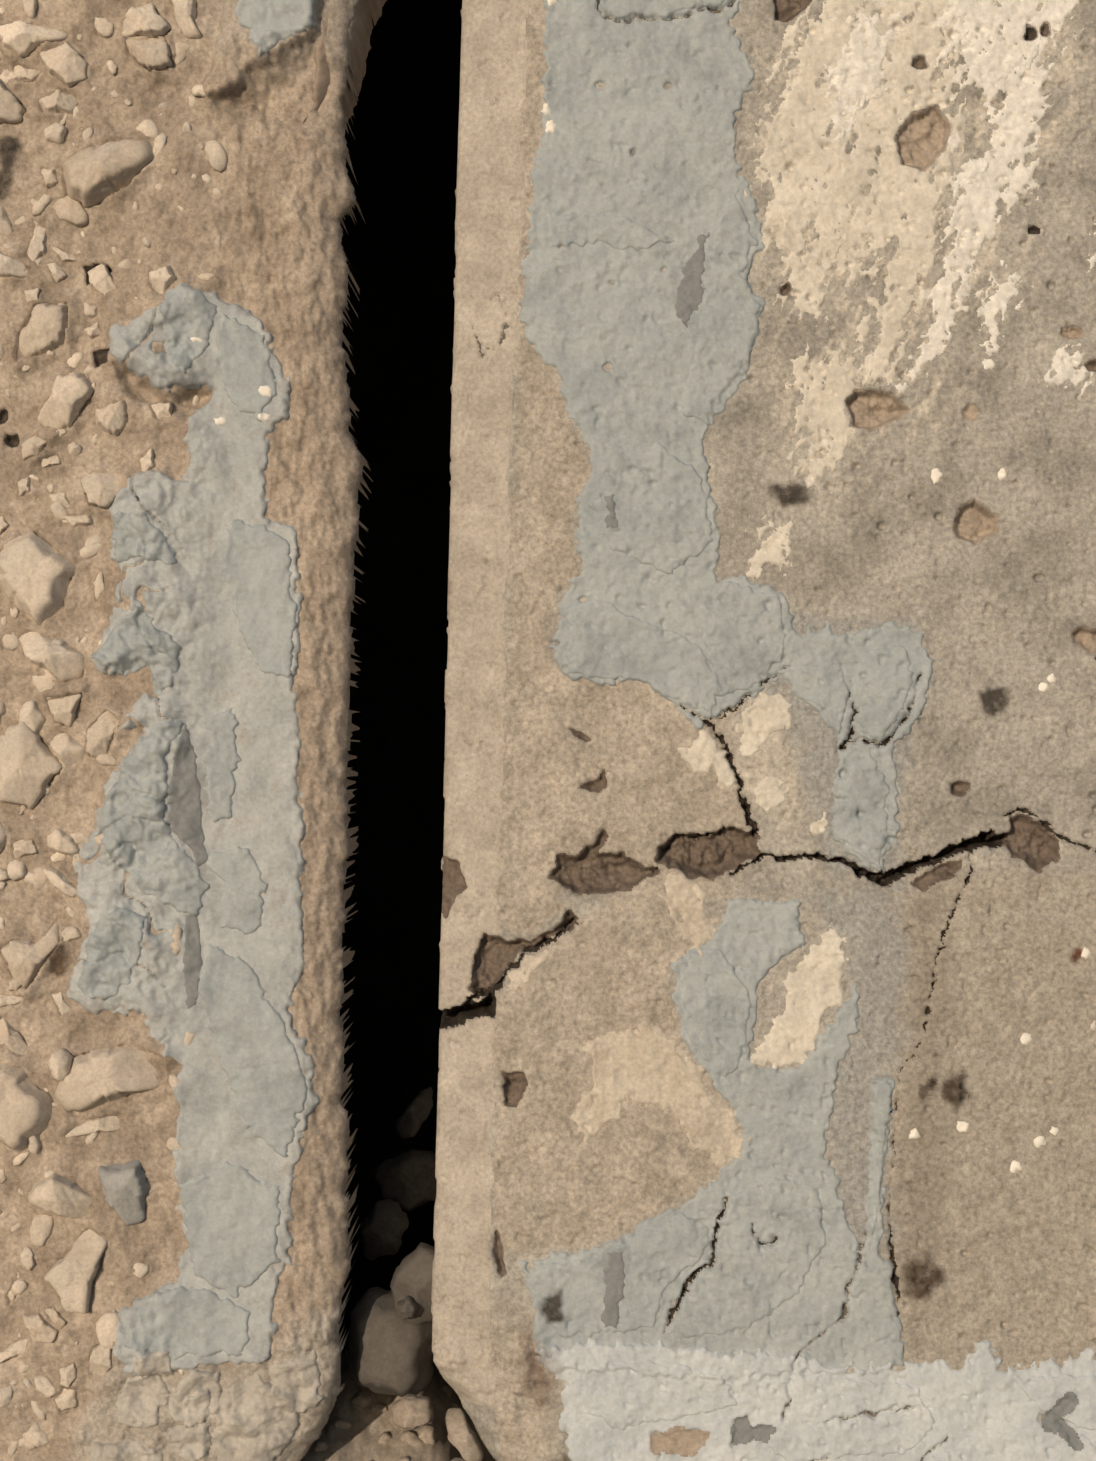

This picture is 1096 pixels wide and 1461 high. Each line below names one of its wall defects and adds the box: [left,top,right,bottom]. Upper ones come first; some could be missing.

peeling [234,0,318,57]
leakage [771,484,808,505]
peeling [518,0,1094,872]
peeling [66,283,326,1461]
peeling [507,950,549,990]
crack [440,667,1096,1359]
peeling [517,873,1096,1461]
crack [828,1406,910,1421]